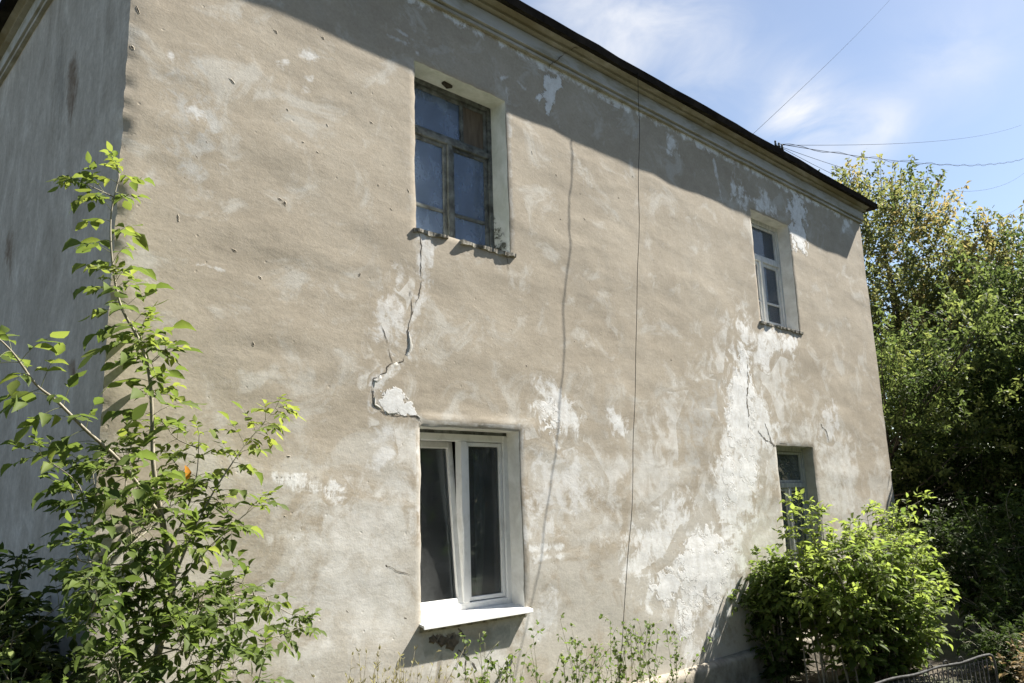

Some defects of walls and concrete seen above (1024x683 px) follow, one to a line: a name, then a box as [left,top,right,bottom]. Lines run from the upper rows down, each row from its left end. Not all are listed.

peeling [401,0,855,257]
peeling [363,386,420,476]
crack [365,224,434,422]
crack [746,363,775,446]
peeling [612,481,752,670]